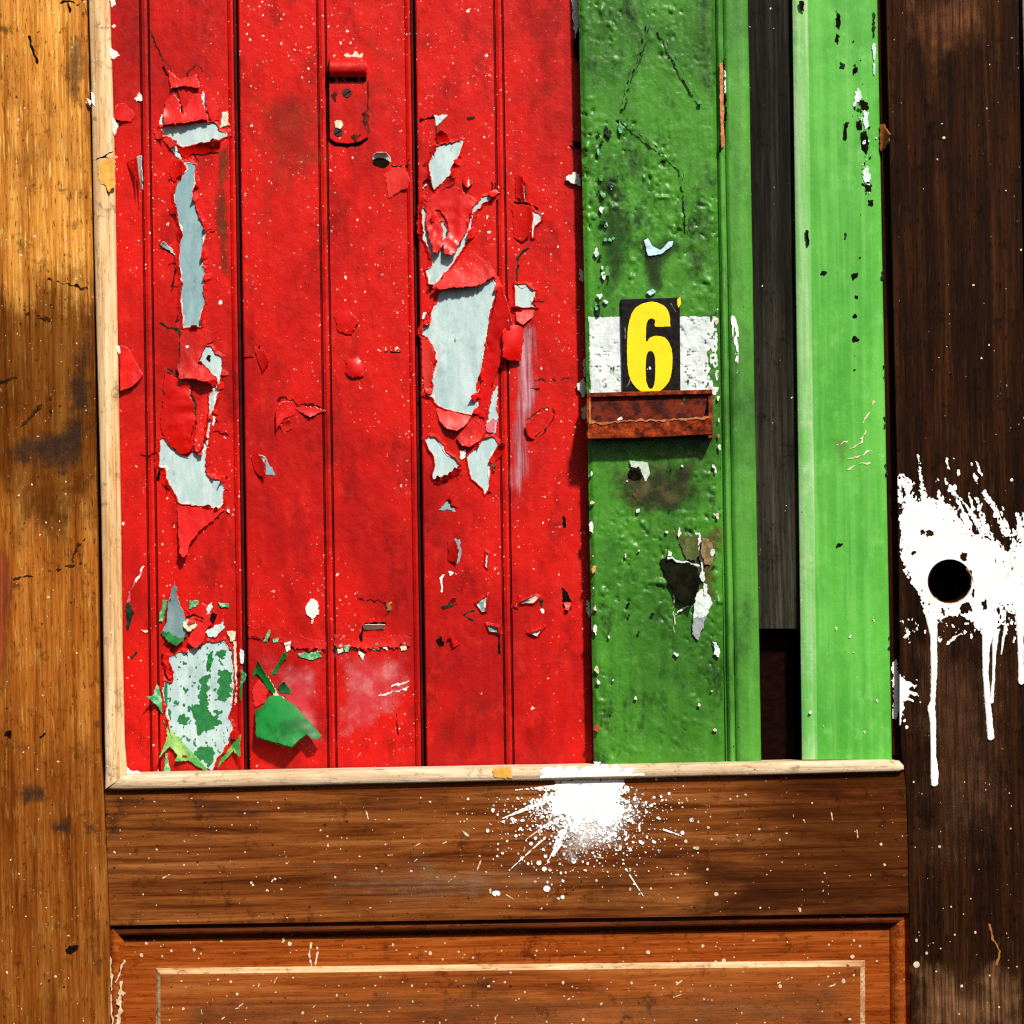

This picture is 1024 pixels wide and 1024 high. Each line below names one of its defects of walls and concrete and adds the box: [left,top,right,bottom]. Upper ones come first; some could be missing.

spalling [839,12,876,75]
peeling [97,155,143,192]
spalling [112,93,142,136]
spalling [843,88,877,206]
spalling [594,173,620,316]
spalling [116,345,143,391]
peeling [140,66,239,558]
peeling [416,114,544,512]
peeling [147,581,322,771]
spalling [358,598,392,642]
spalling [441,592,503,654]
peeling [660,527,716,640]